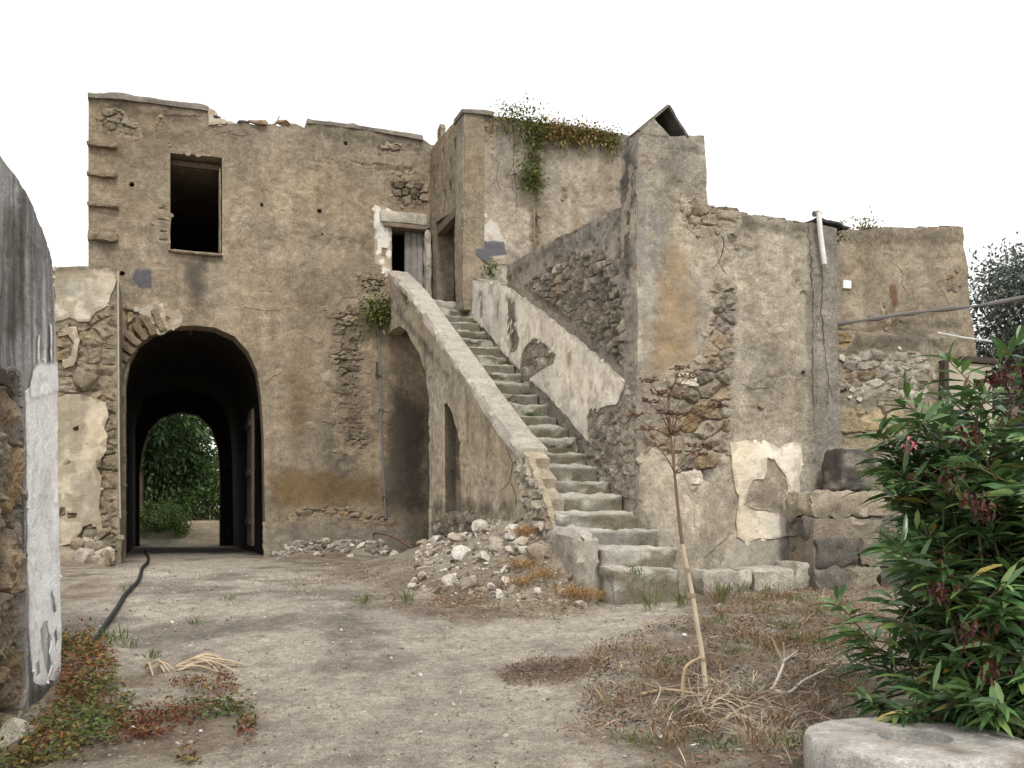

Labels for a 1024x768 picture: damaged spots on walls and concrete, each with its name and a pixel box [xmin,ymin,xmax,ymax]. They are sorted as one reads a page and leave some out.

flaking render [308,141,430,294]
flaking render [679,193,745,252]
flaking render [53,266,117,369]
flaking render [122,299,183,515]
flaking render [323,302,376,457]
flaking render [468,246,804,546]
crack [807,226,833,439]
flaking render [837,328,937,450]
peeling [22,387,109,686]